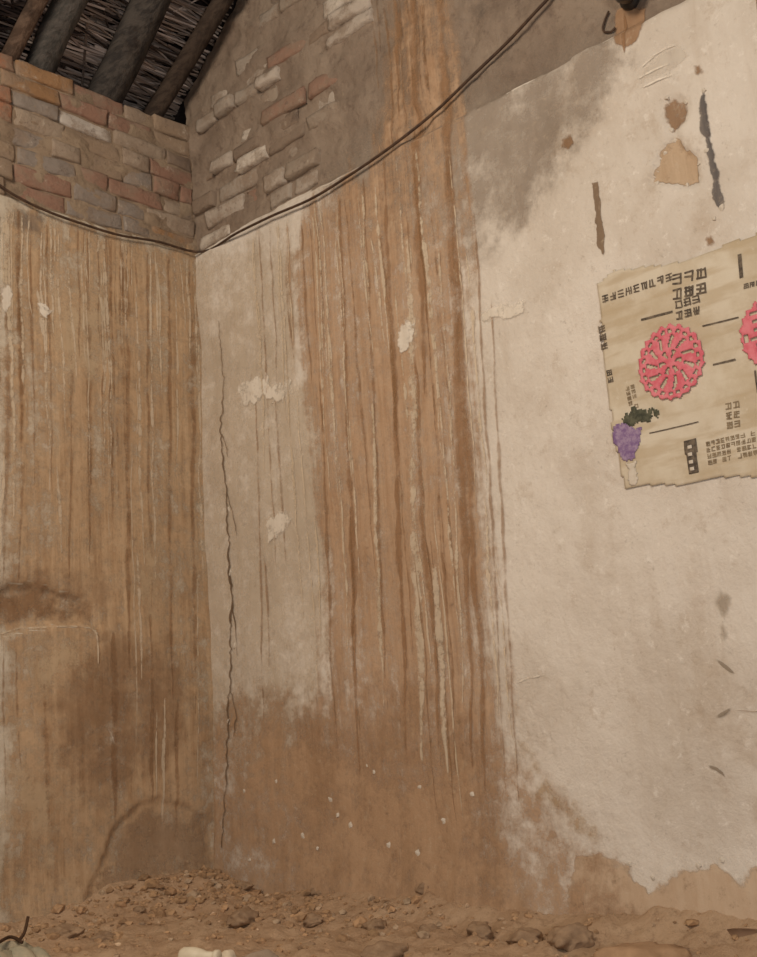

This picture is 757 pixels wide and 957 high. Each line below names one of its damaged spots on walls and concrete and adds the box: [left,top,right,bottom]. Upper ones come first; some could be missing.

leakage [565,33,613,118]
spalling [654,88,725,221]
leakage [0,0,587,922]
leakage [568,853,757,920]